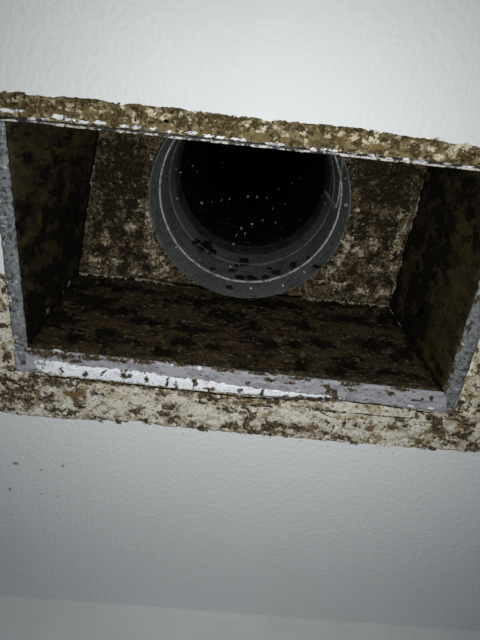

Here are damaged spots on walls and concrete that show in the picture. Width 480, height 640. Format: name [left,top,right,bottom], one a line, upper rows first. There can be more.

leakage [0,91,480,378]
leakage [0,325,213,418]
leakage [129,404,210,432]
leakage [143,360,363,438]
leakage [319,420,358,445]
leakage [385,385,434,402]
leakage [422,383,480,453]